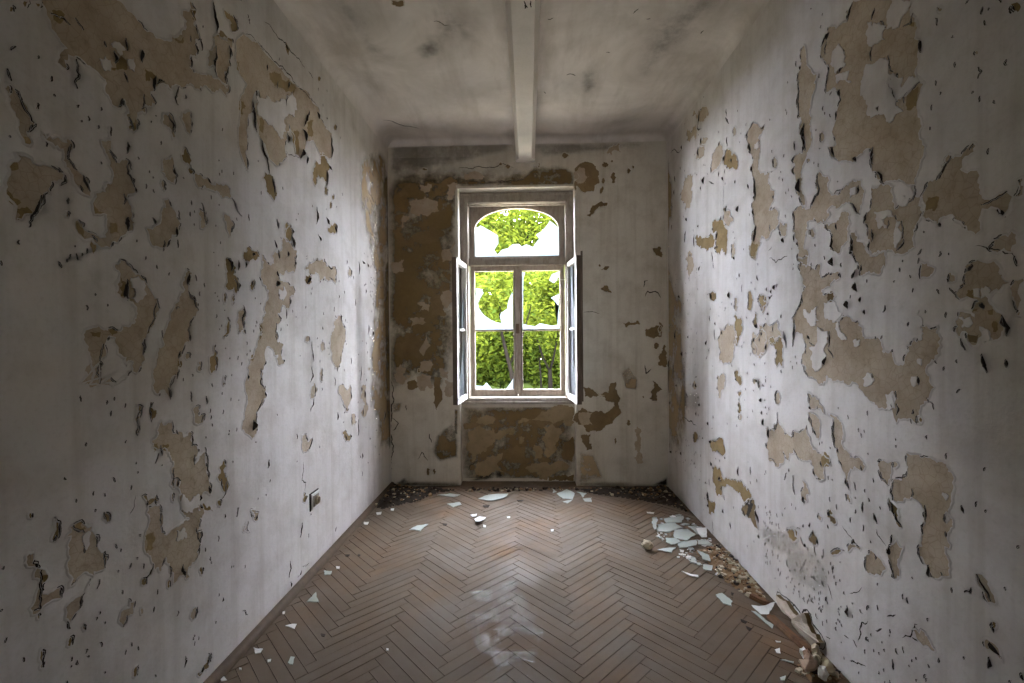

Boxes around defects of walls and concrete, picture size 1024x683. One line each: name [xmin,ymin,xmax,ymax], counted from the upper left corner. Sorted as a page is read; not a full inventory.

peeling [1,0,338,254]
peeling [78,220,375,595]
peeling [572,381,644,465]
peeling [671,0,1024,581]
peeling [22,511,111,649]